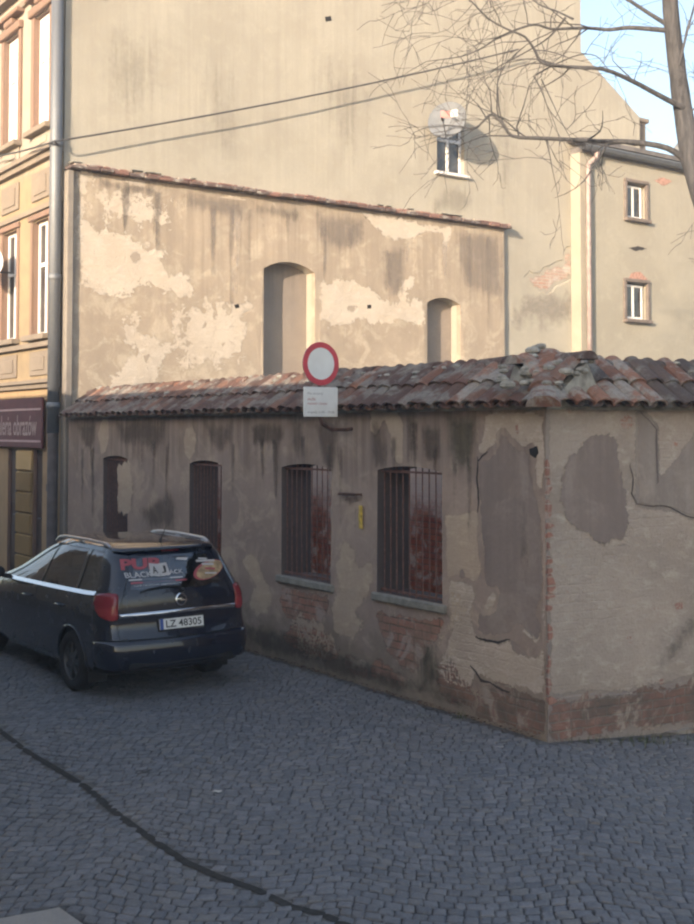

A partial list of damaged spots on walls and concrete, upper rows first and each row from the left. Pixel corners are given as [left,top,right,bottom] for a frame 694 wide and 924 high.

flaking render [75,171,253,386]
flaking render [319,275,426,329]
flaking render [369,412,404,463]
crack [630,467,694,518]
flaking render [243,554,272,617]
flaking render [290,541,373,659]
spalling [376,409,694,742]